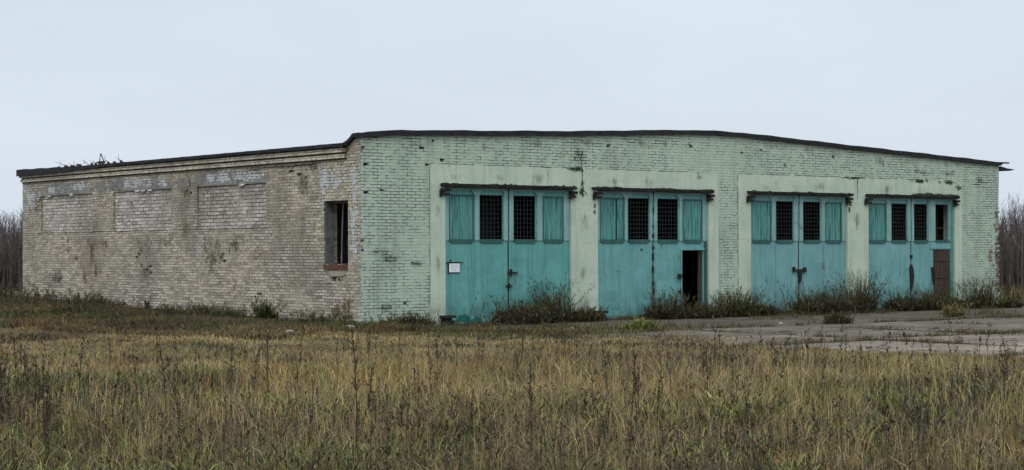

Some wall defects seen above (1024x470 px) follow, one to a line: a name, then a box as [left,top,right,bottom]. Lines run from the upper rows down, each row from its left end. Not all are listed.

peeling [24,169,265,213]